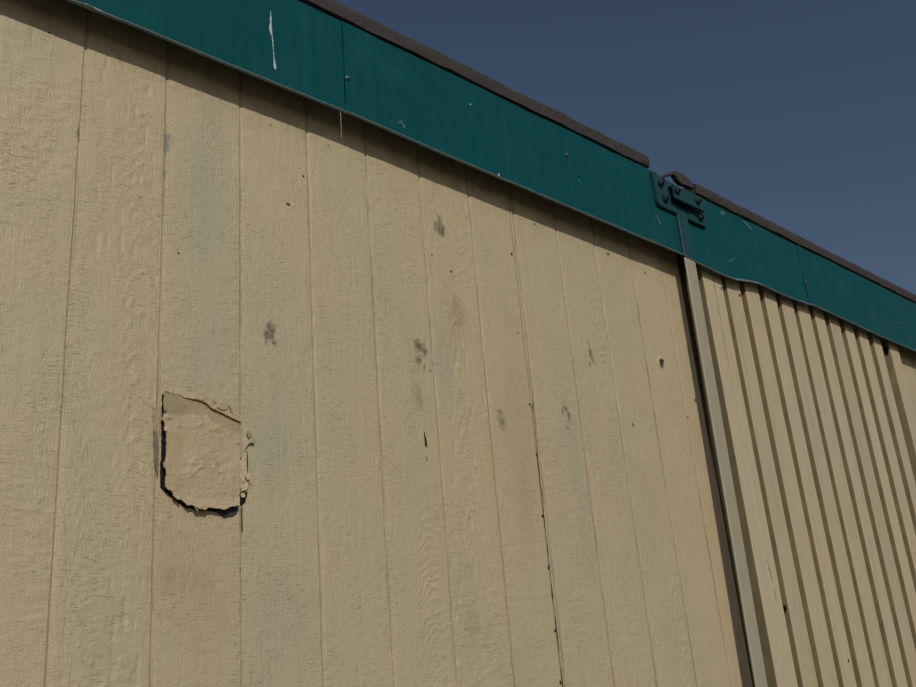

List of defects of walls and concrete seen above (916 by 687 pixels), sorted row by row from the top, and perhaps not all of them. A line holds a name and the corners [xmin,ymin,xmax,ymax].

peeling [152,391,256,518]